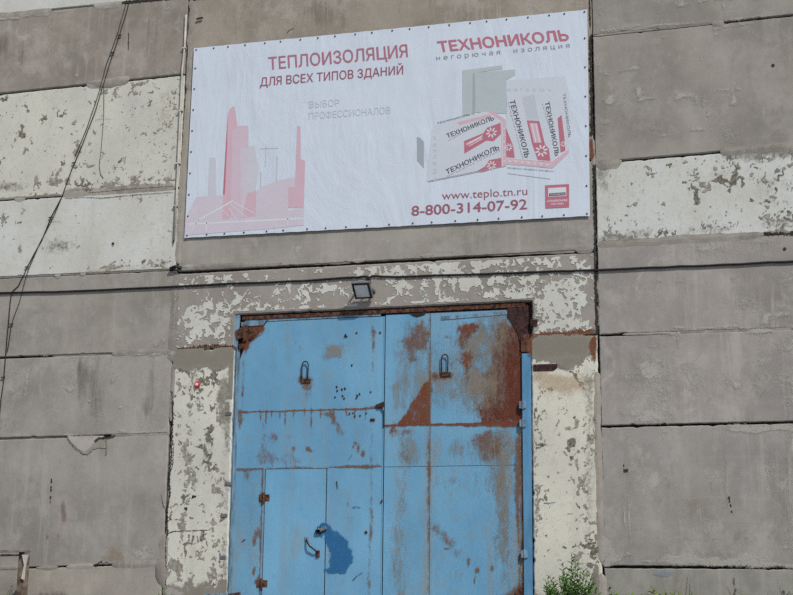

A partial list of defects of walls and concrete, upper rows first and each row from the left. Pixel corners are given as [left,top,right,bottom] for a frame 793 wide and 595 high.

peeling [0,80,180,202]
peeling [596,199,684,241]
peeling [666,147,793,230]
peeling [101,257,173,271]
corrosion [181,326,265,351]
spalling [67,435,115,455]
corrosion [238,406,378,430]
peeling [163,255,601,595]
corrosion [385,322,598,543]
corrosion [252,516,264,588]